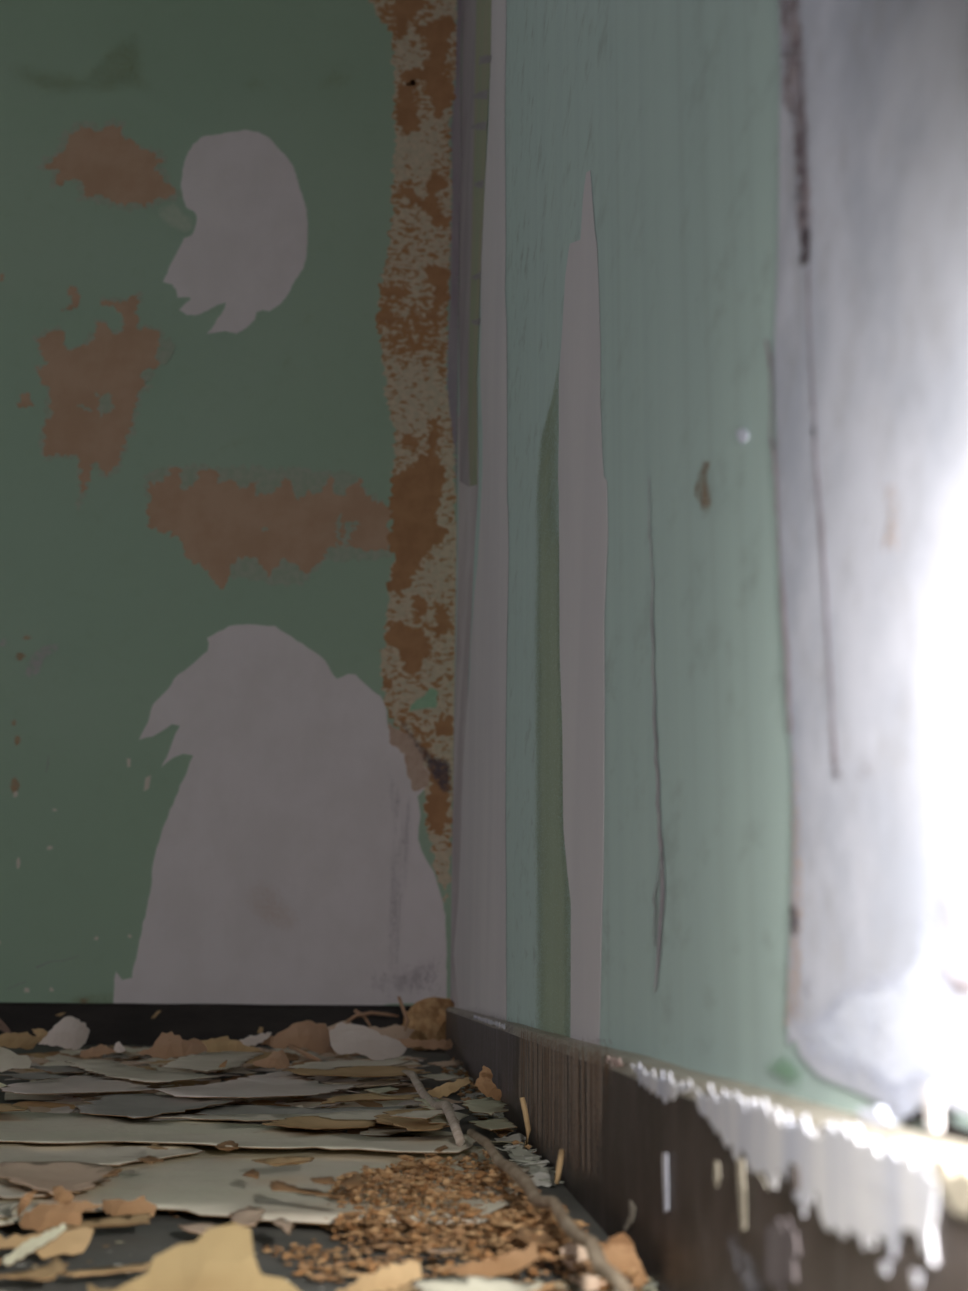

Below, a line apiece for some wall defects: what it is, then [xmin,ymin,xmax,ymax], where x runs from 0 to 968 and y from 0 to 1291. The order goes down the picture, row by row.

peeling [36,117,308,334]
peeling [16,286,176,511]
peeling [113,0,509,1030]
peeling [465,0,968,1291]
crack [649,526,664,993]
peeling [137,1143,168,1164]
peeling [178,1206,295,1235]
peeling [242,1156,366,1199]